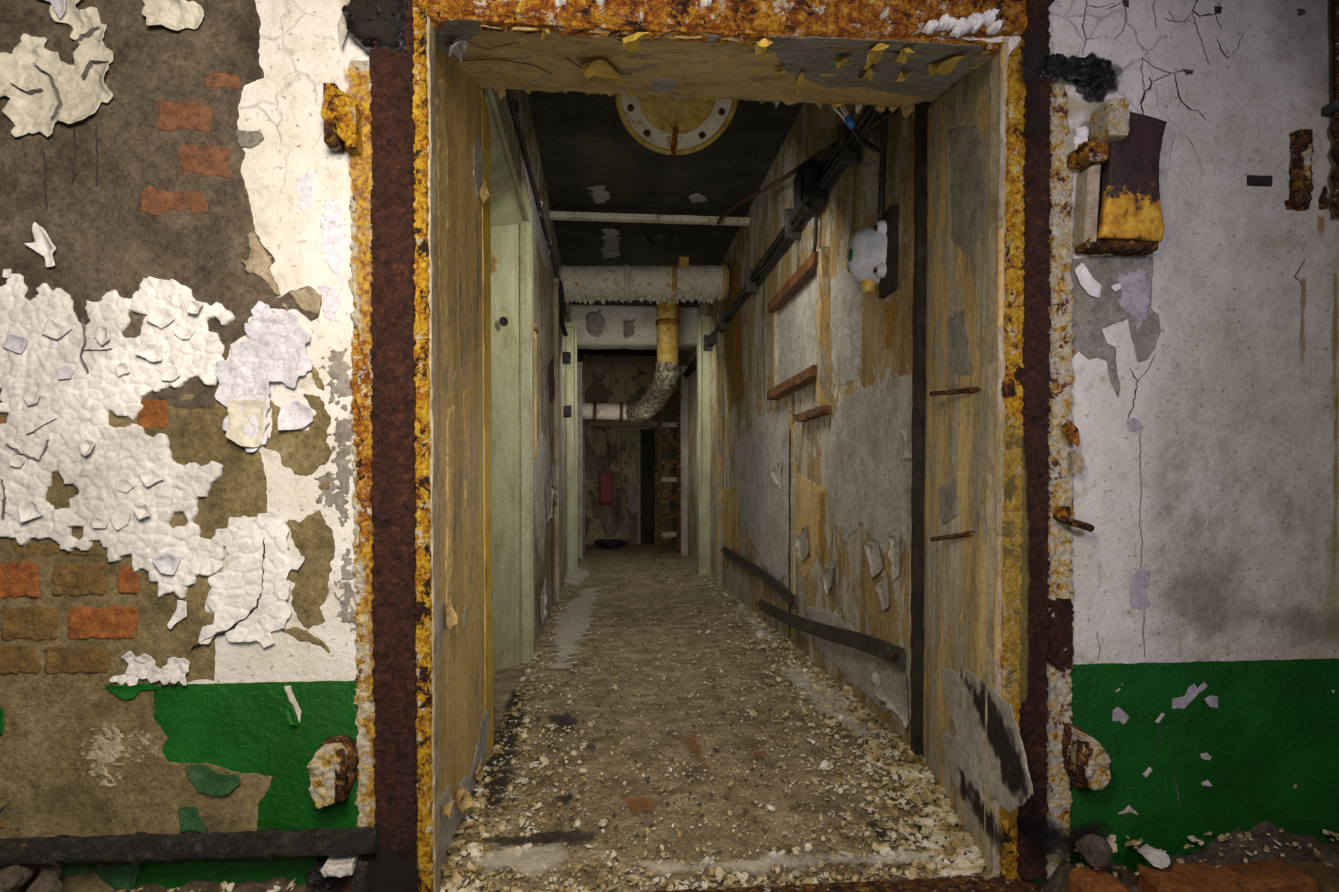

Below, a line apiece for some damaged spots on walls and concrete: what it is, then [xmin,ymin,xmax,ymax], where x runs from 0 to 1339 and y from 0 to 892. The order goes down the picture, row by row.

crack [1082,0,1243,120]
flaking render [0,0,348,360]
corrosion [1318,186,1331,231]
flaking render [46,472,79,510]
flaking render [108,348,356,653]
corrosion [345,70,375,699]
corrosion [722,261,743,411]
corrosion [1061,420,1085,474]
peeling [1071,253,1161,398]
flaking render [0,526,273,839]
corrosion [1047,598,1075,672]
spalling [1155,682,1218,724]